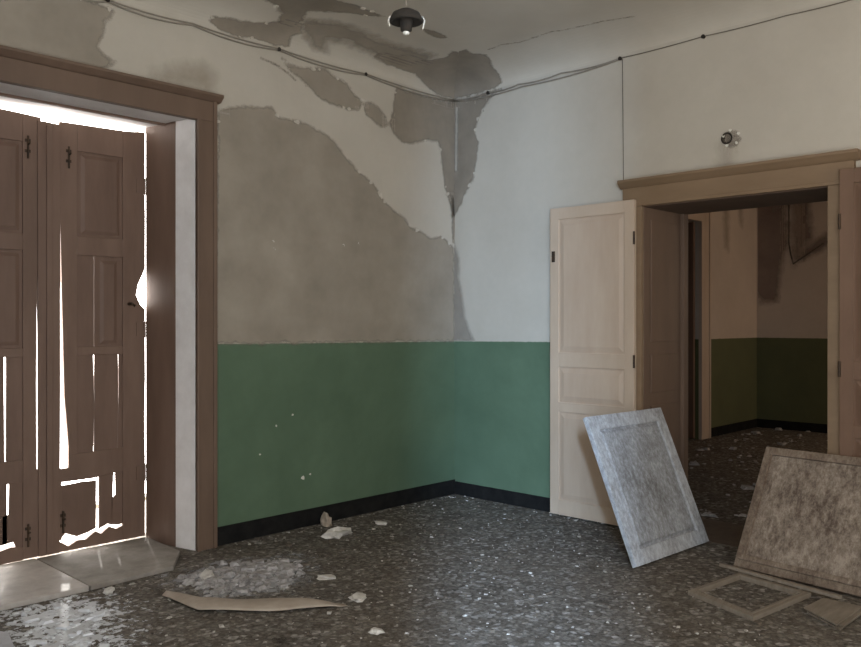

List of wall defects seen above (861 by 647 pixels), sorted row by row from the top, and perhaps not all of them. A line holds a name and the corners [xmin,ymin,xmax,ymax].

peeling [0,0,112,68]
peeling [210,0,378,47]
peeling [274,64,388,126]
peeling [217,106,454,344]